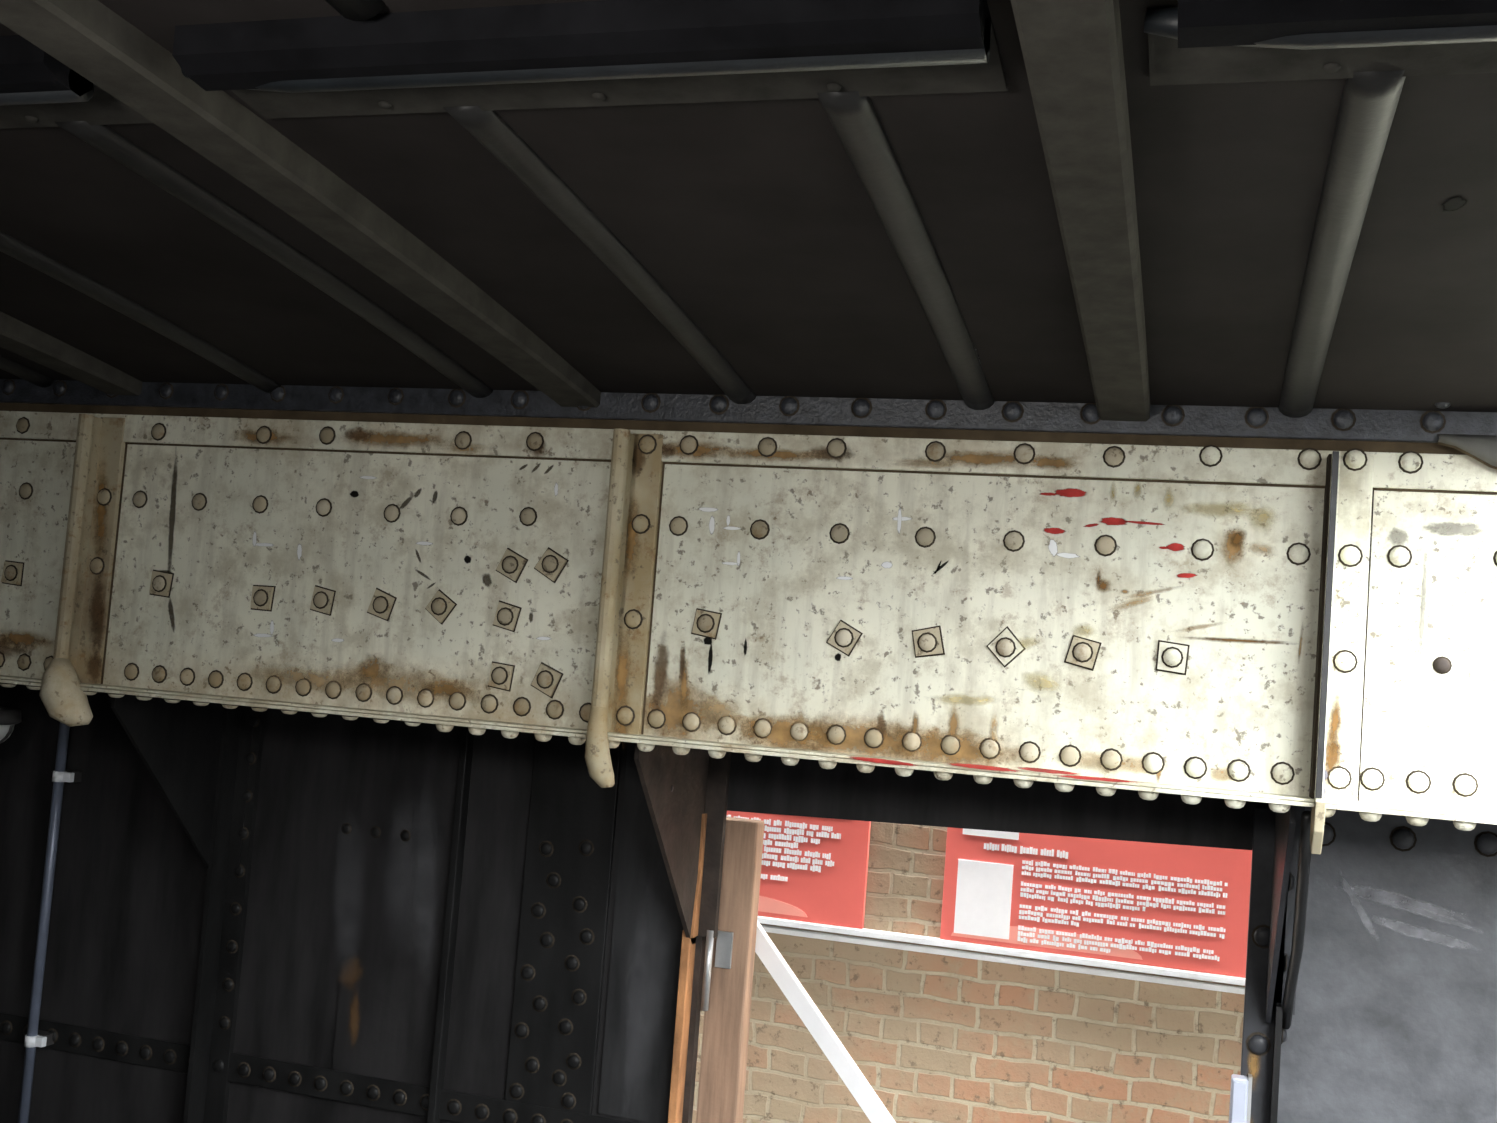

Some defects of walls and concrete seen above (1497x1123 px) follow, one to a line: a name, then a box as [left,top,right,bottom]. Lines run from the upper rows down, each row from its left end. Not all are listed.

rust [632,446,644,473]
rust [625,506,637,572]
rust [1224,532,1269,561]
rust [0,632,52,654]
rust [271,658,472,696]
rust [616,645,629,705]
rust [645,645,1015,764]
rust [1325,697,1341,773]